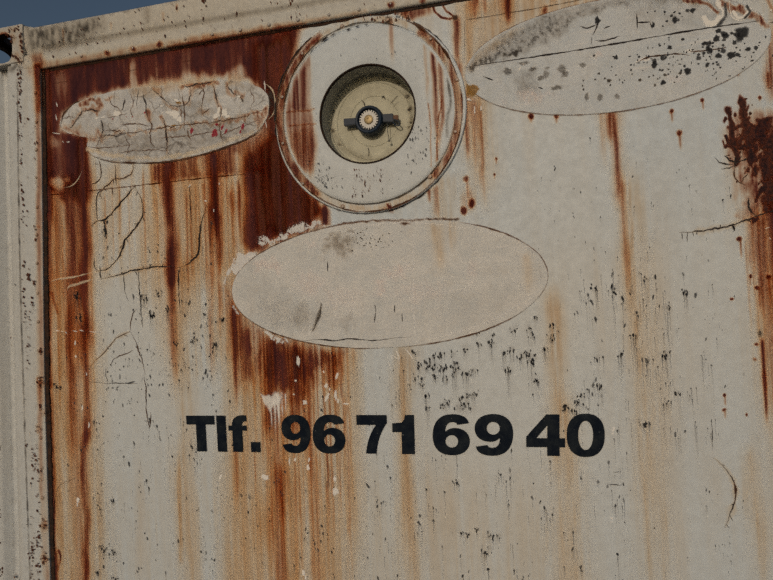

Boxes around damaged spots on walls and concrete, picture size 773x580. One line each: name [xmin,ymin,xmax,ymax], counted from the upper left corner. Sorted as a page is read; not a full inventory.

corrosion [401,0,459,56]
corrosion [418,30,460,120]
crack [679,156,773,240]
corrosion [722,95,773,298]
crack [89,162,212,426]
corrosion [30,20,336,580]
corrosion [755,331,767,413]
crack [711,421,737,526]